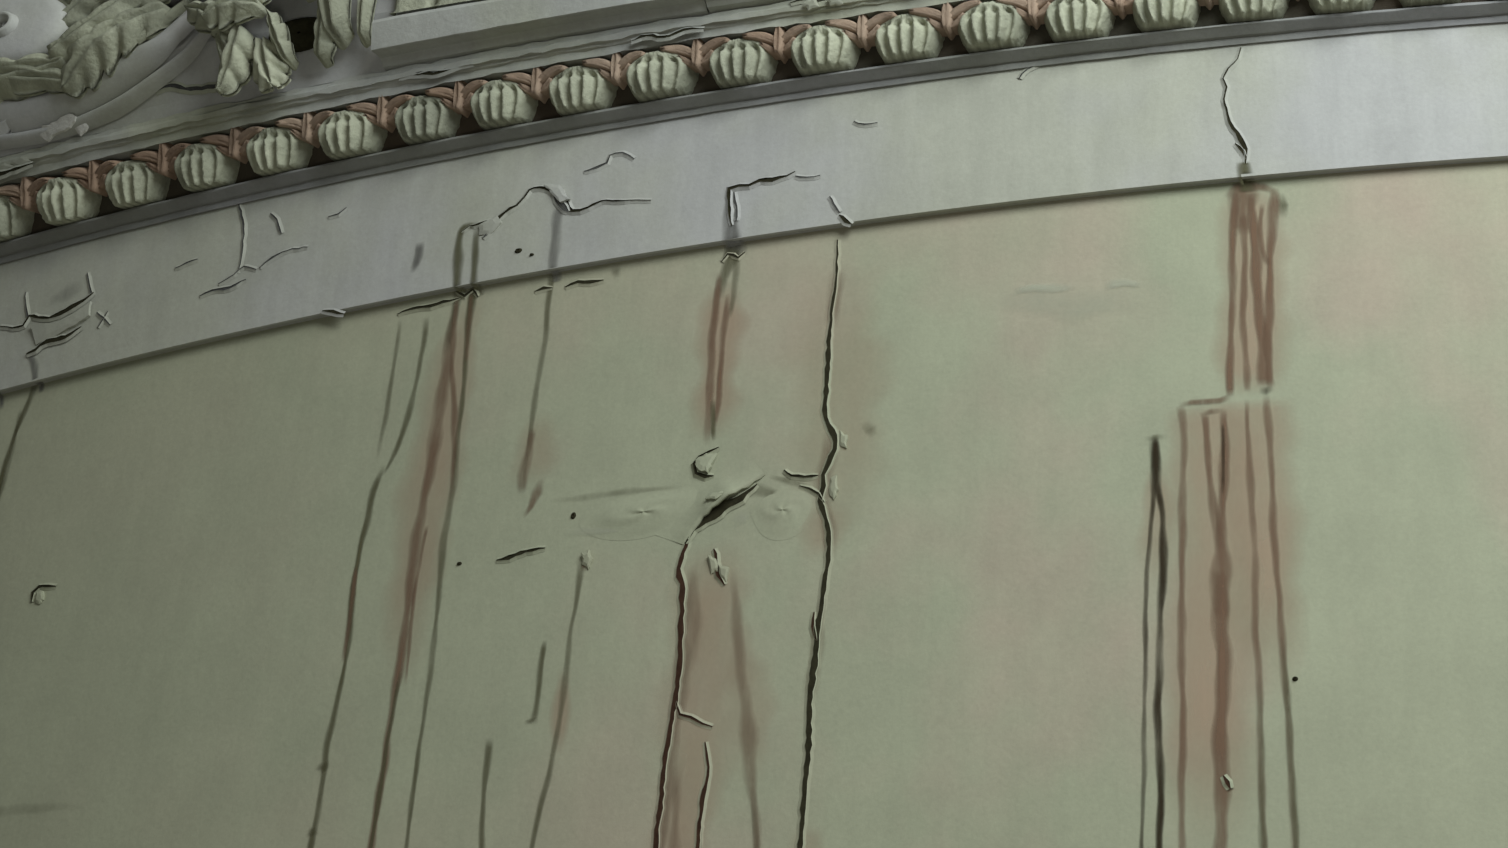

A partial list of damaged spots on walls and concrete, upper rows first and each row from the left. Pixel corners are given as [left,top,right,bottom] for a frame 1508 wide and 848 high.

crack [1220,47,1251,191]
crack [461,150,652,240]
crack [322,308,346,317]
crack [398,296,461,317]
crack [535,278,604,295]
corrosion [707,283,731,435]
flaking render [656,445,765,545]
flaking render [708,548,730,587]
crack [725,170,854,848]
corrosion [1179,183,1278,848]
corrosion [1254,407,1285,667]
corrosion [369,437,438,848]